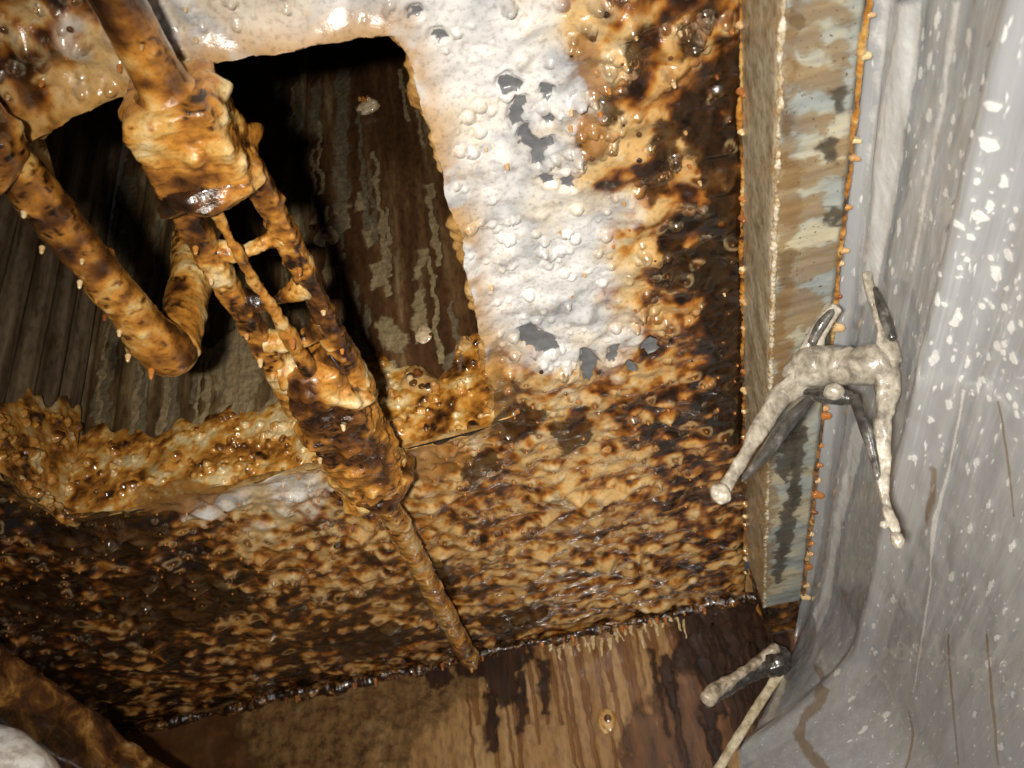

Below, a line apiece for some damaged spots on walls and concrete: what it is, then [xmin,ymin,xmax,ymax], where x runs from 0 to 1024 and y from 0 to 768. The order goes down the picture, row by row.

corrosion [569,34,614,99]
peeling [498,74,574,187]
water stain [599,95,623,128]
corrosion [833,0,874,306]
water stain [244,58,464,372]
corrosion [735,0,746,447]
peeling [519,323,559,352]
peeling [580,344,638,381]
peeling [640,336,659,354]
corrosion [134,479,232,515]
water stain [548,616,687,661]
corrosion [494,621,678,768]